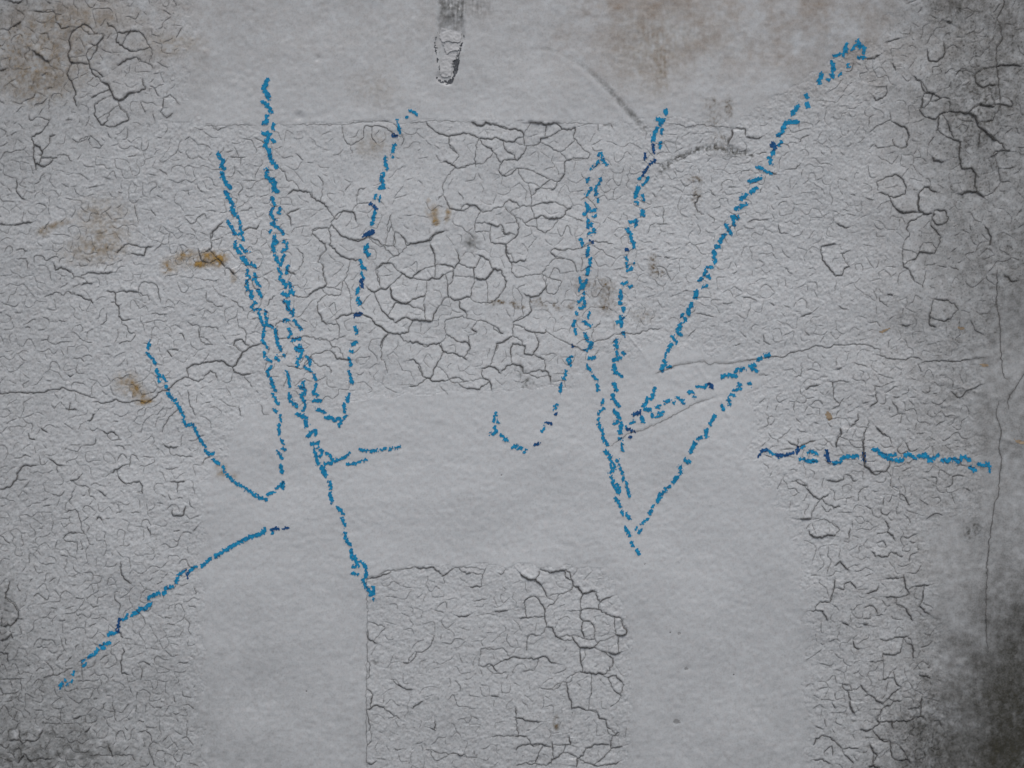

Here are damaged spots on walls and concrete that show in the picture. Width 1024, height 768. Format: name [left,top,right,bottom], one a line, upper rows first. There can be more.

crack [0,115,283,768]
rust [181,252,224,267]
crack [605,42,1023,768]
damp [971,650,1024,768]